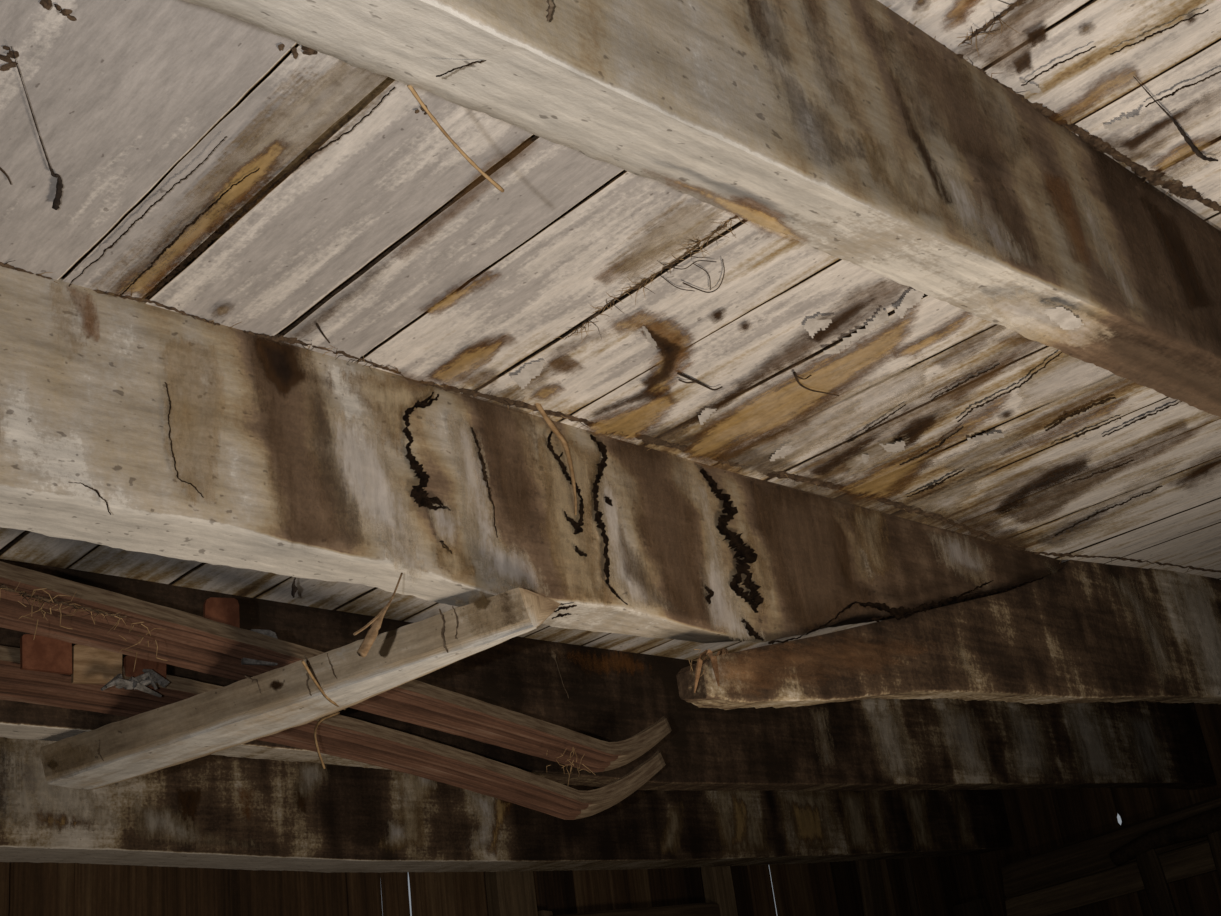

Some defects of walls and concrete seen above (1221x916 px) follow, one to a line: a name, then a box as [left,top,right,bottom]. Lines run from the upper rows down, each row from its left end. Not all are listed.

damp [747,0,789,61]
damp [945,0,977,28]
damp [890,44,1037,260]
damp [960,0,1067,74]
damp [1053,69,1139,122]
damp [252,271,379,545]
crack [402,392,451,511]
crack [470,427,498,537]
crack [552,605,577,619]
crack [547,431,628,605]
crack [699,468,1043,644]
damp [587,280,1221,625]